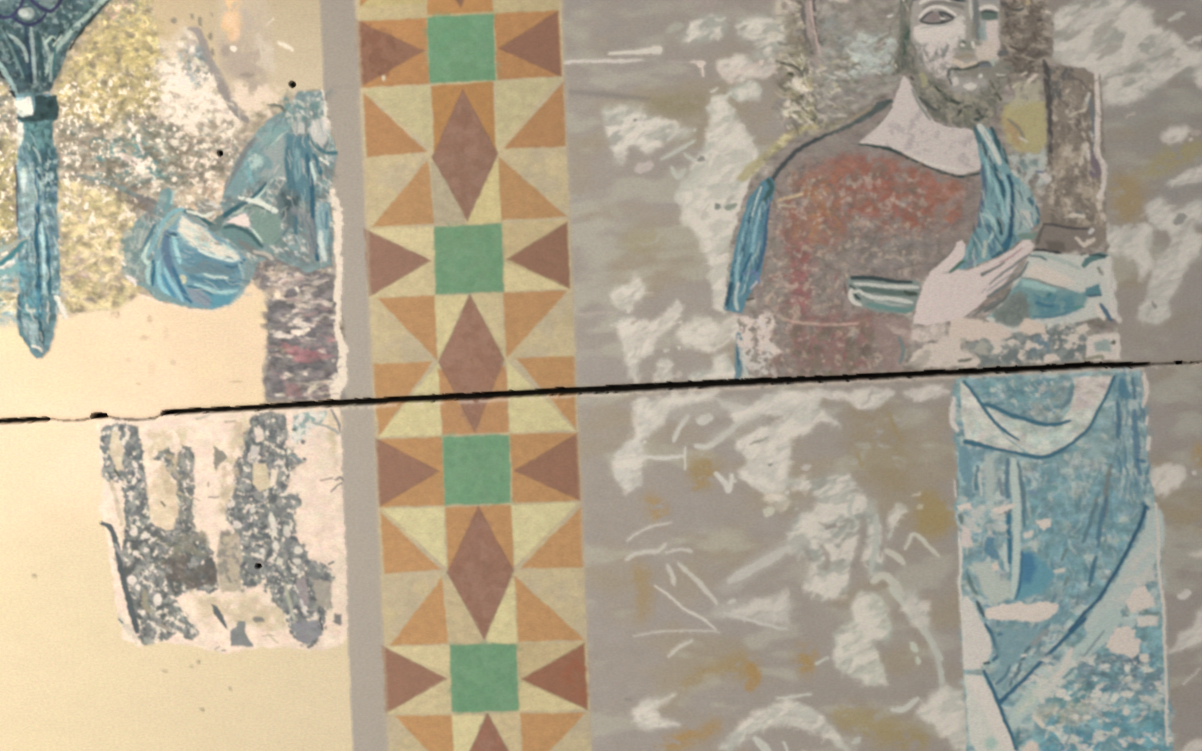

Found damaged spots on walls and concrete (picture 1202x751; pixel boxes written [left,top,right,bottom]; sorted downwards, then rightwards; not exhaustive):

peeling [601,13,790,381]
peeling [1052,0,1202,118]
peeling [1107,167,1202,326]
peeling [1160,127,1202,144]
crack [0,357,1202,429]
peeling [612,384,968,751]